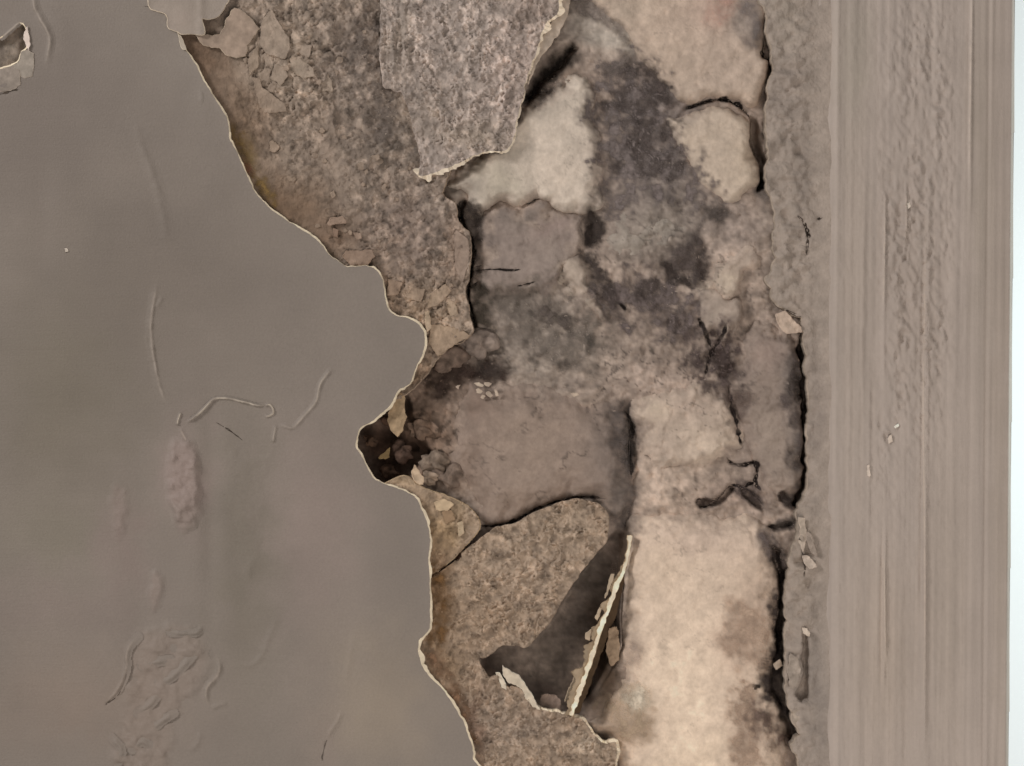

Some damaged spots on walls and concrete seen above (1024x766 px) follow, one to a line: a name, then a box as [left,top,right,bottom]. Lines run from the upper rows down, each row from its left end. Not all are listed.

spalling [0,23,34,92]
leakage [461,43,751,418]
spalling [147,0,620,766]
leakage [425,359,507,399]
crack [698,319,727,374]
spalling [757,0,817,766]
leakage [610,403,636,525]
crack [696,387,761,508]
leakage [699,484,762,509]